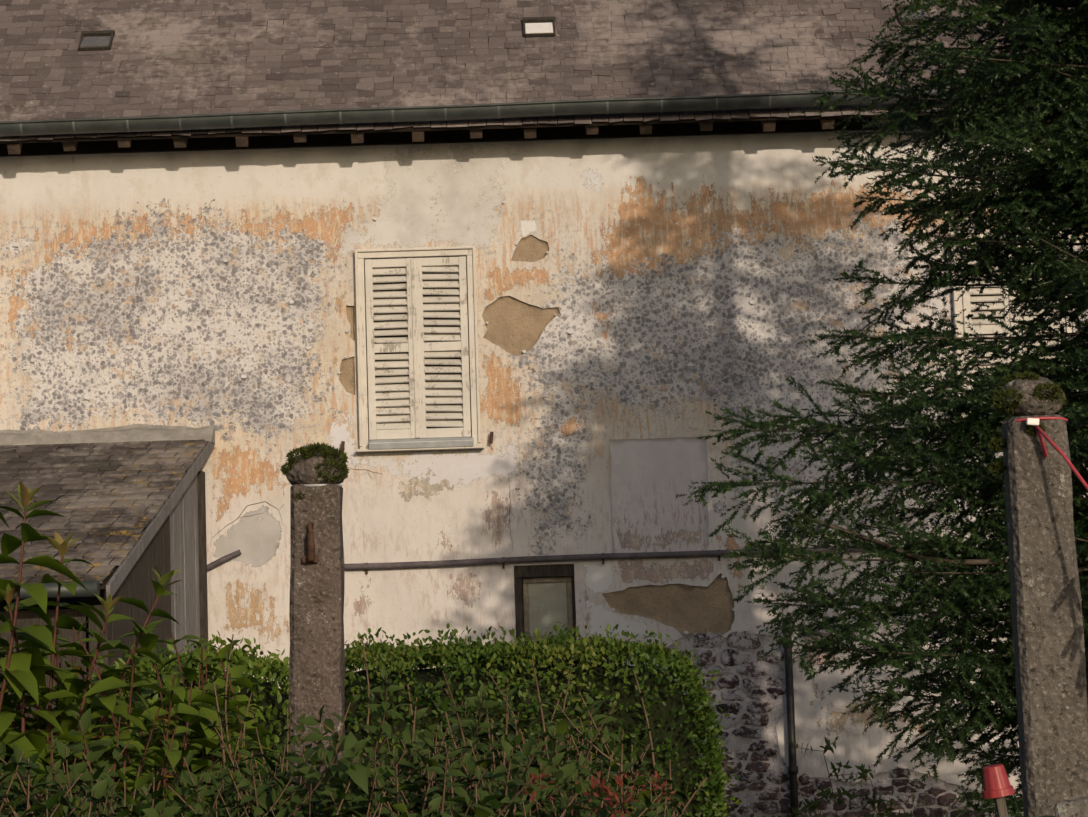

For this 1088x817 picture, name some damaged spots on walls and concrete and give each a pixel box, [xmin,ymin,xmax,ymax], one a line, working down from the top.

damp [35,200,354,271]
damp [0,266,39,348]
peeling [0,198,355,454]
peeling [482,206,1003,556]
spalling [602,559,736,636]